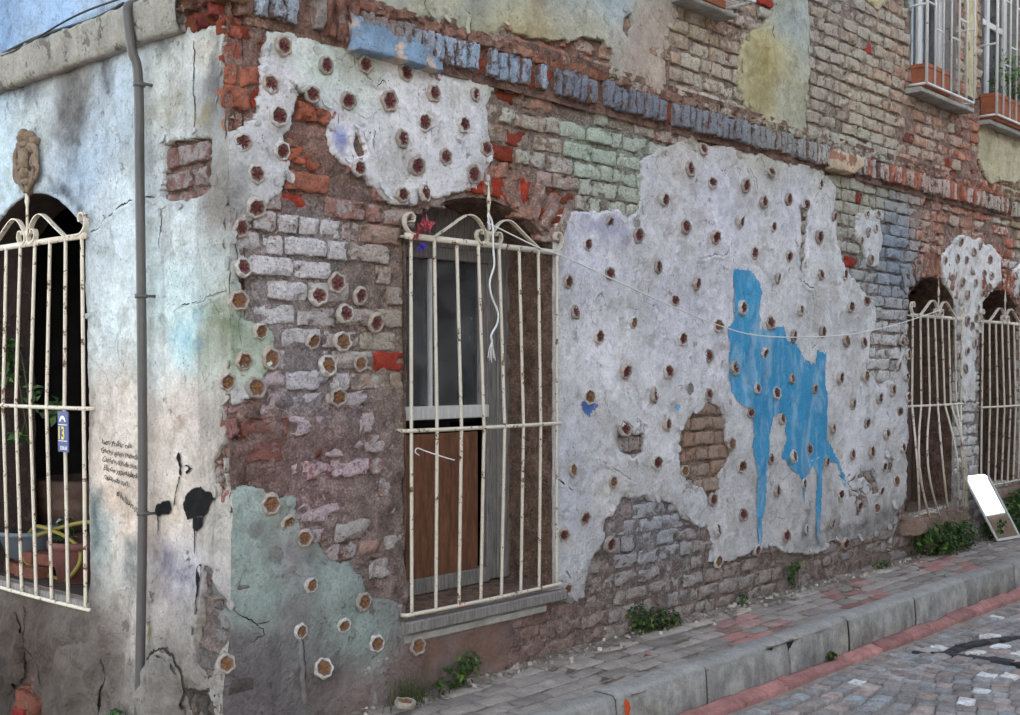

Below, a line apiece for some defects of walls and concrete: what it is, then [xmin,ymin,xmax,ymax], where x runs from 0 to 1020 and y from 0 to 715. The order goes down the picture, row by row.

crack [188,40,196,128]
spalling [176,0,301,139]
spalling [490,21,615,74]
spalling [649,0,778,112]
spalling [788,0,1020,196]
spalling [156,127,229,210]
spalling [798,201,813,280]
spalling [212,86,719,622]
spalling [820,171,1020,488]
spalling [505,320,991,669]
spalling [183,550,254,715]